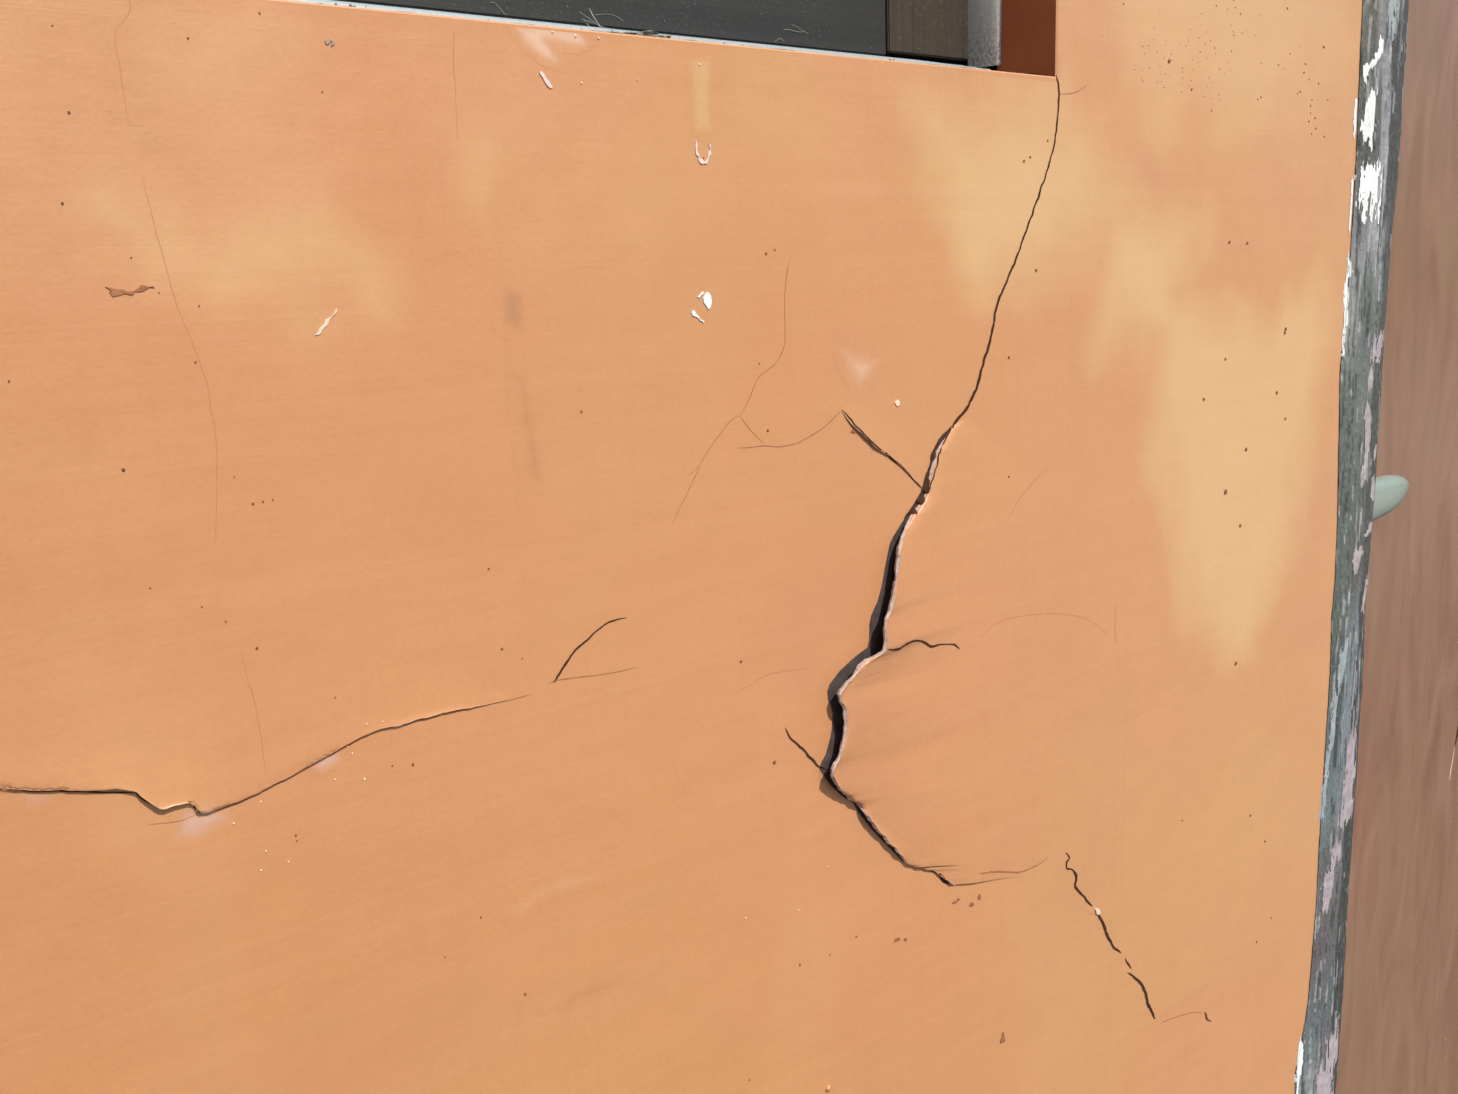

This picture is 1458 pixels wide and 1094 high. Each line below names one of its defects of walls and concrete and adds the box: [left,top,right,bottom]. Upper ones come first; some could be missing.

peeling [1349,0,1400,233]
peeling [1341,258,1353,357]
peeling [1360,330,1384,501]
crack [673,75,1210,1023]
peeling [1352,519,1372,614]
crack [0,618,636,825]
peeling [1318,636,1357,914]
peeling [1294,1019,1338,1094]